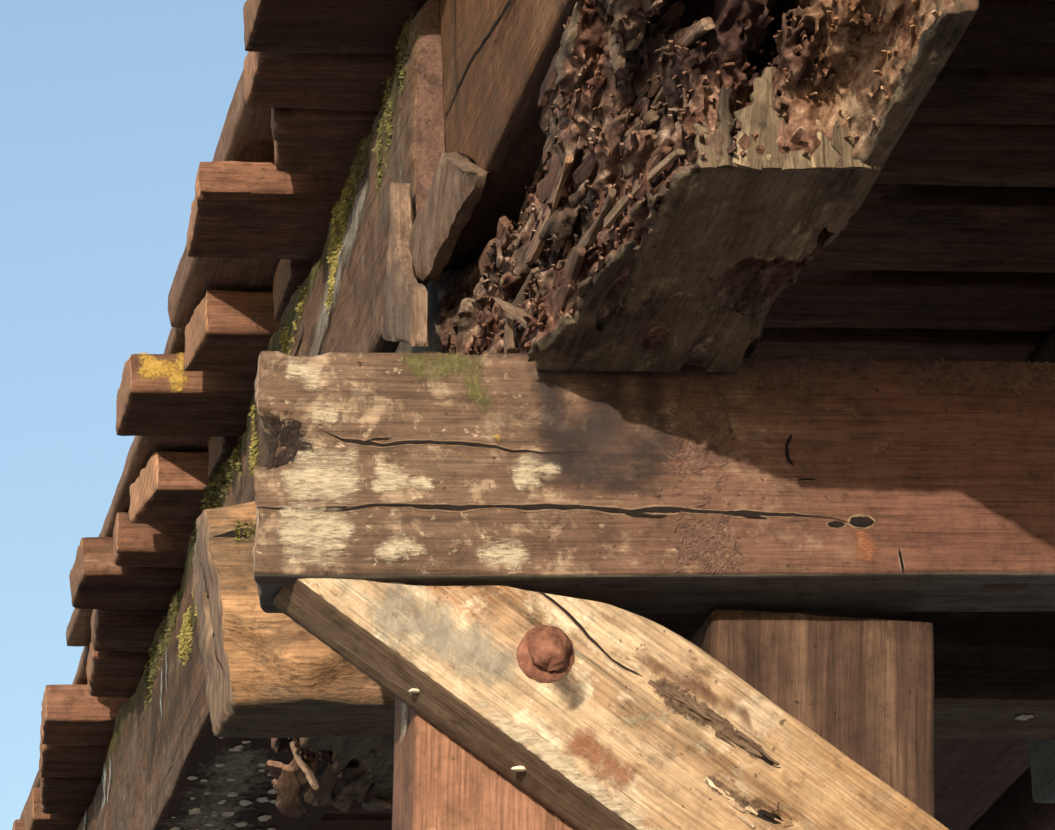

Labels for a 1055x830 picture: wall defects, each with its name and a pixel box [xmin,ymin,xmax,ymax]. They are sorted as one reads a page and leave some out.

peeling [693,67,881,173]
peeling [492,296,532,353]
crack [311,423,579,456]
crack [785,434,818,481]
crack [196,502,848,599]
crack [536,591,642,676]
peeling [271,741,372,818]